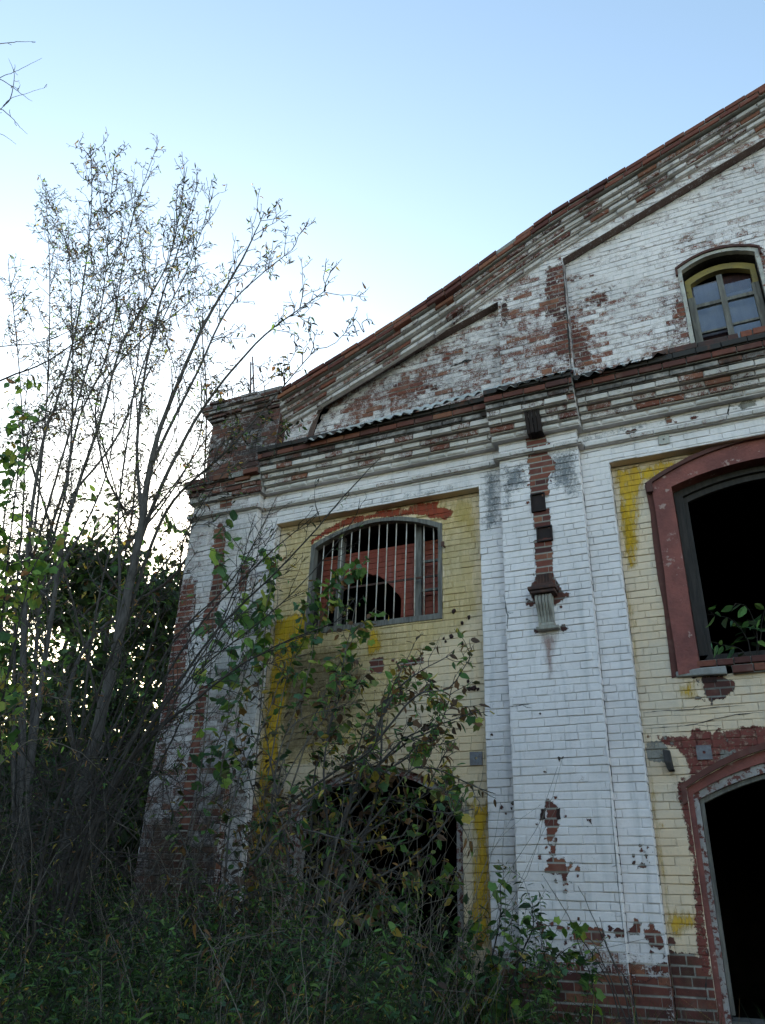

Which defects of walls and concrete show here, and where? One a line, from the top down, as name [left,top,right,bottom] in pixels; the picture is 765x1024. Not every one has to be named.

spalling [499,299,512,328]
flaking render [540,257,616,371]
flaking render [670,292,689,324]
flaking render [382,378,446,401]
water stain [485,465,524,528]
flaking render [521,436,570,608]
water stain [553,453,575,494]
spalling [692,676,735,705]
peeling [535,796,580,894]
peeling [647,725,765,979]
peeling [536,917,676,985]